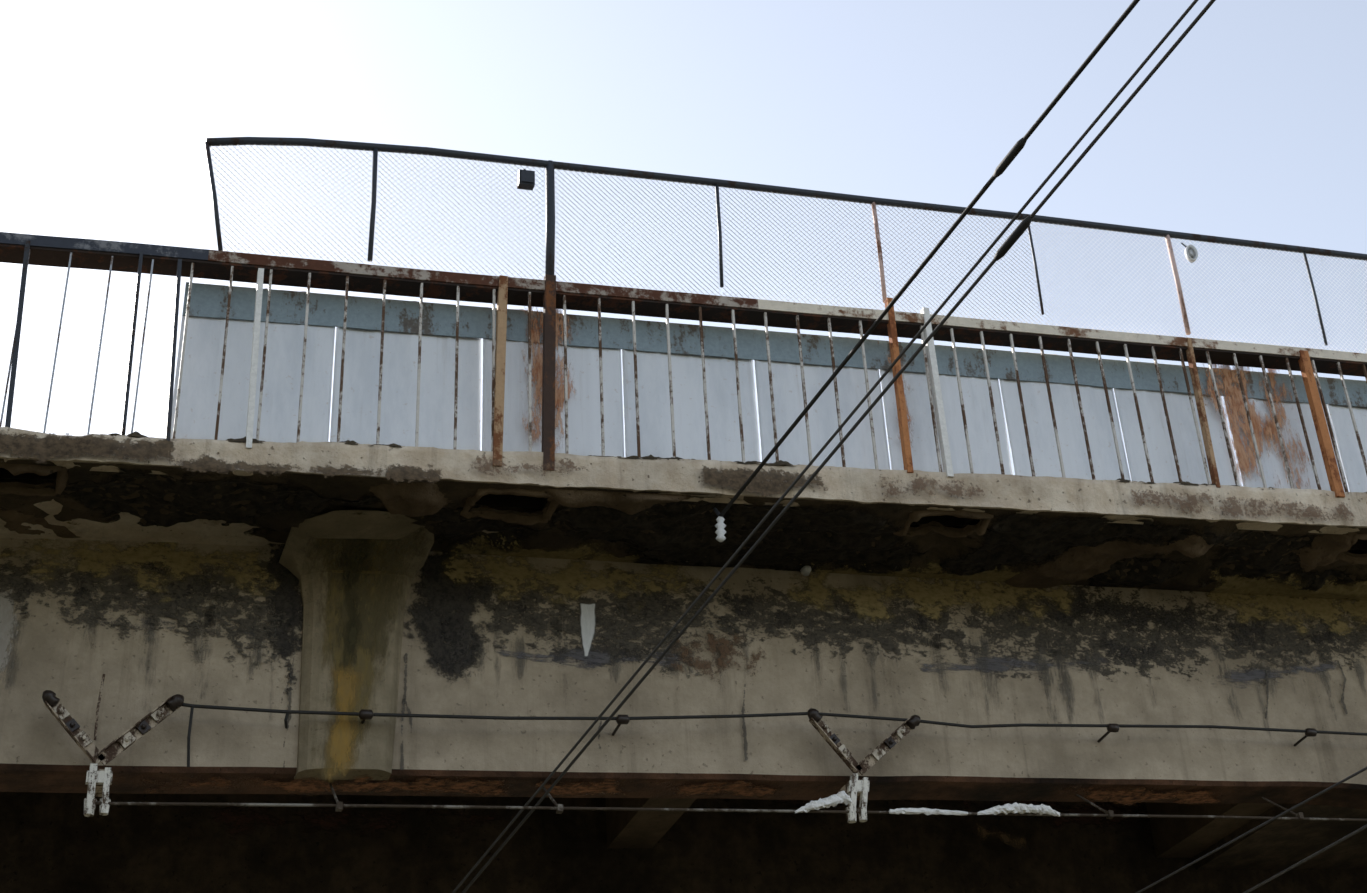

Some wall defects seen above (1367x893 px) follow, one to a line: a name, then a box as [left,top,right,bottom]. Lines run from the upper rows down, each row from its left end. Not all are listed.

rust [523,307,575,449]
rust [1205,364,1309,489]
spalling [0,509,80,538]
leakage [0,542,303,694]
leakage [307,516,1367,779]